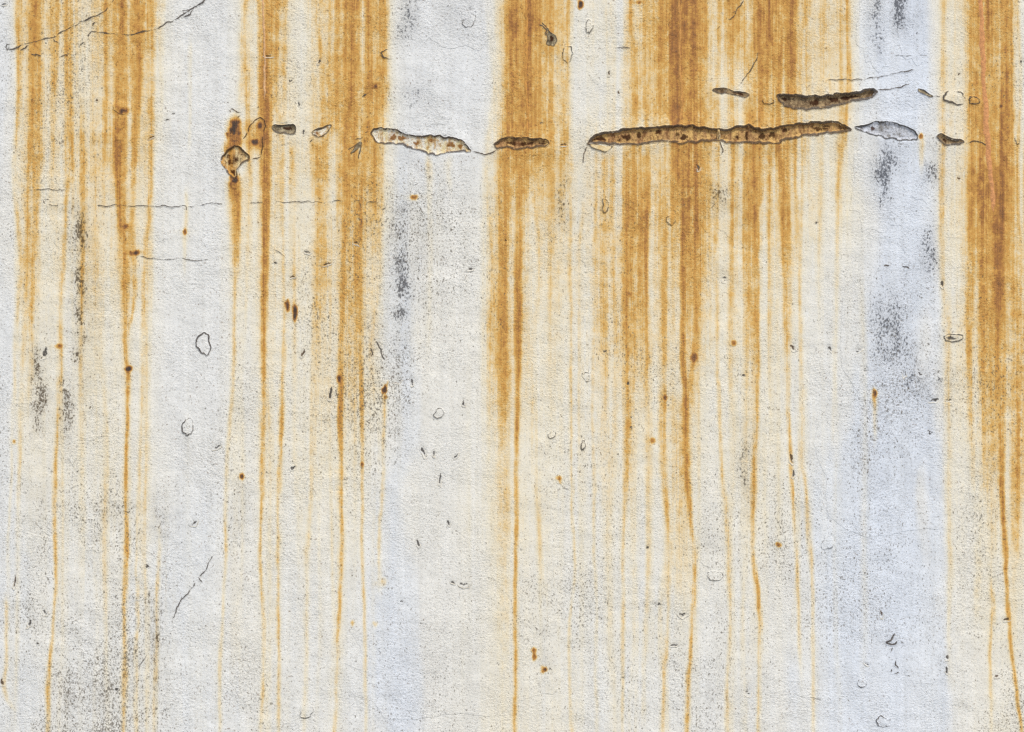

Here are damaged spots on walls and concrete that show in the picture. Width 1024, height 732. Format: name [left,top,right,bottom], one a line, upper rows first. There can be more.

rust [0,0,79,714]
crack [5,0,206,58]
rust [100,0,170,490]
rust [119,539,164,652]
peeling [220,101,333,179]
rust [215,0,390,732]
peeling [348,126,568,160]
rust [490,0,738,732]
rust [625,0,856,732]
peeling [582,83,986,164]
rust [917,0,1024,732]